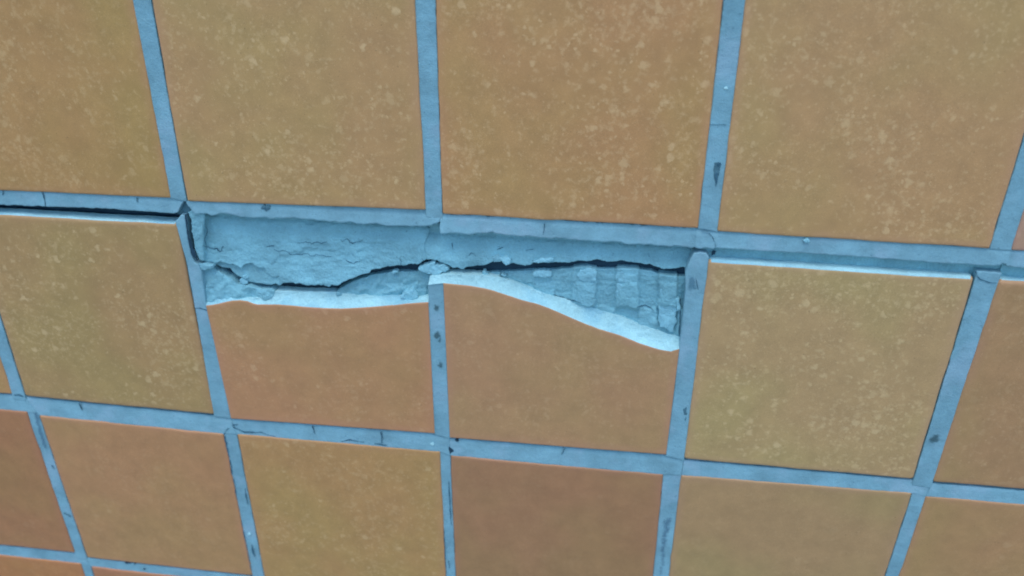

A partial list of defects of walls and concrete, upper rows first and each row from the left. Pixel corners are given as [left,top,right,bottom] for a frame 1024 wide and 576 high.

crack [180,214,198,261]
crack [280,259,698,288]
spalling [177,202,692,454]